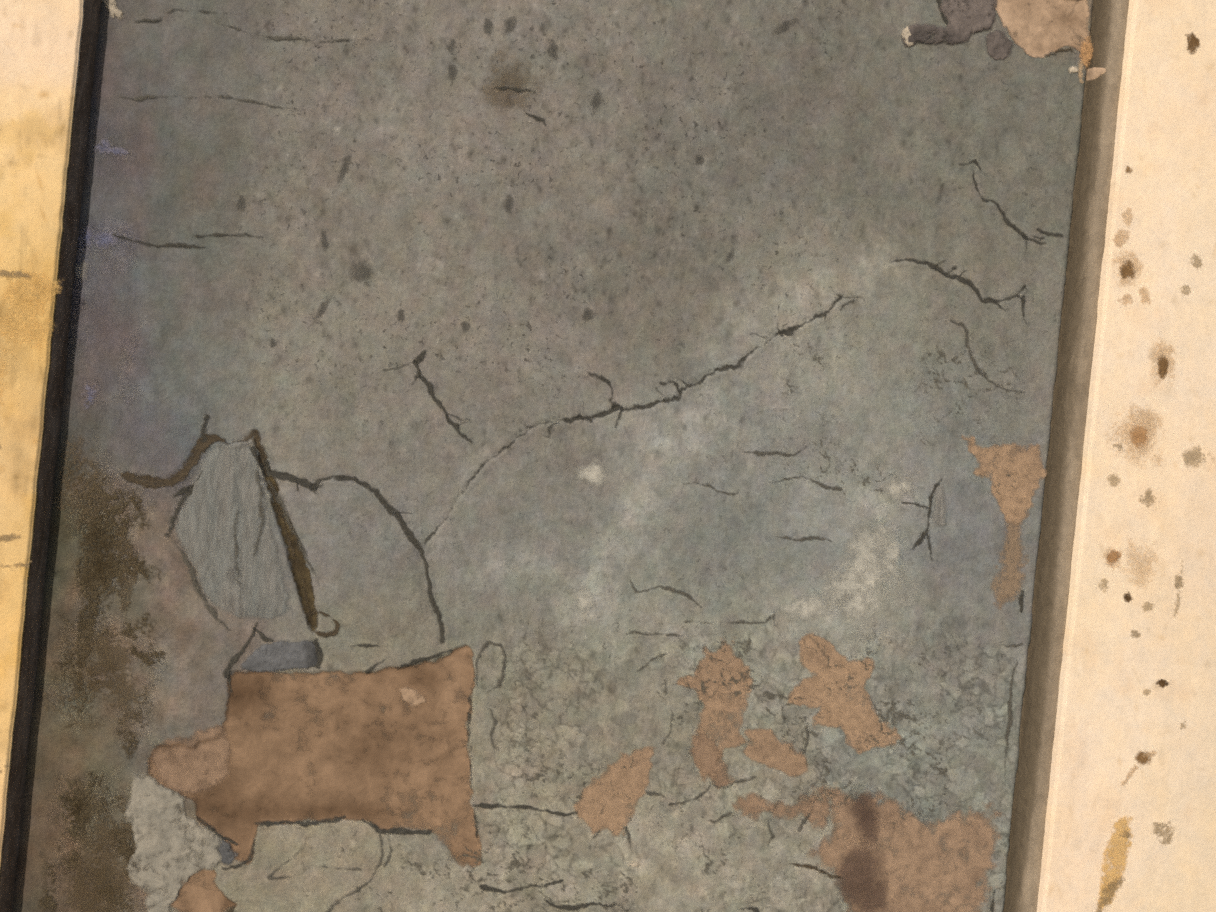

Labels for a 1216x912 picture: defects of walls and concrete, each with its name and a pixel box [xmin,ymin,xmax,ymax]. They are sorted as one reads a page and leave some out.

spalling [994,0,1089,58]
crack [960,159,1063,248]
crack [384,294,858,479]
mould [39,438,165,758]
crack [121,414,444,678]
peeling [963,437,1046,607]
mould [40,773,136,912]
spalling [125,646,481,912]
peeling [574,747,653,835]
peeling [677,643,807,788]
peeling [788,634,901,754]
peeling [733,789,998,912]